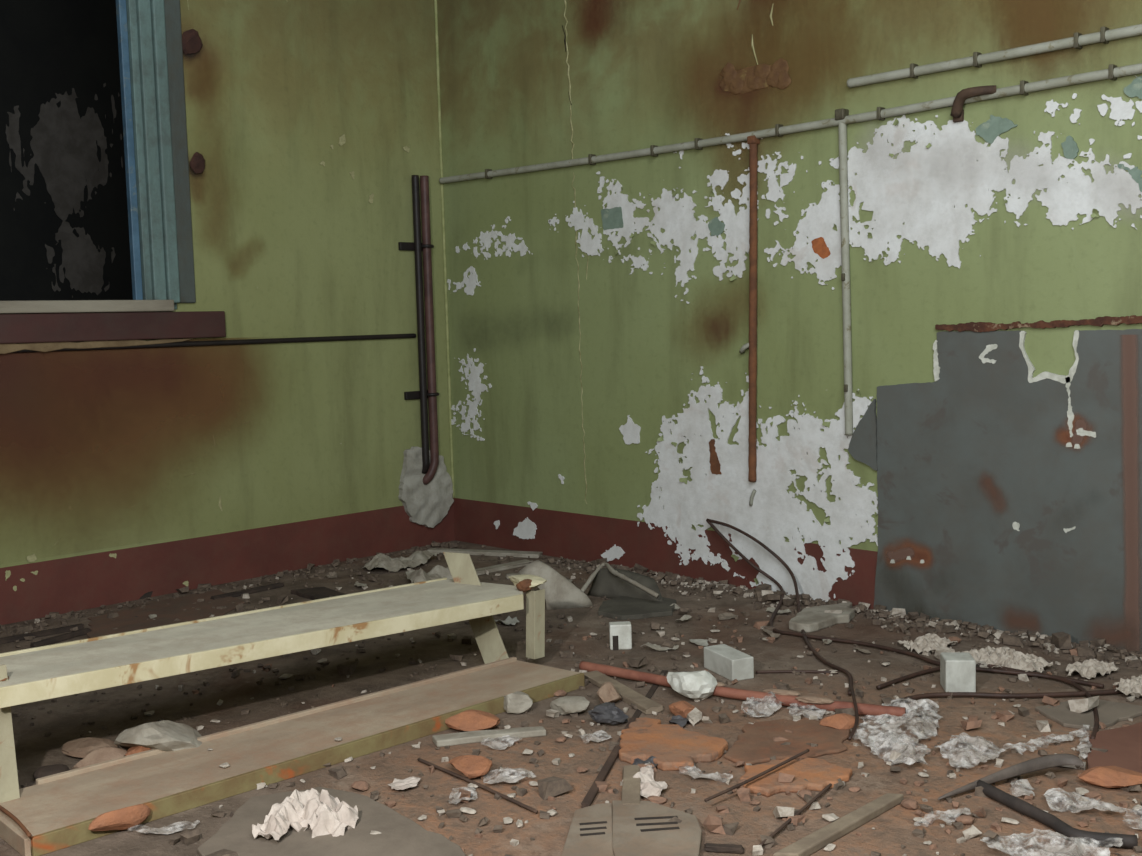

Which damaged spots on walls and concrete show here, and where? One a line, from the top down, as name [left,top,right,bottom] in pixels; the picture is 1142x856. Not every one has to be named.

rust [683,0,838,170]
peeling [1097,76,1142,140]
peeling [548,93,1142,304]
peeling [447,216,533,296]
rust [0,338,255,504]
peeling [451,348,492,441]
peeling [932,340,940,382]
peeling [979,344,998,364]
peeling [1065,377,1096,438]
peeling [619,366,878,602]
rust [935,315,1142,652]